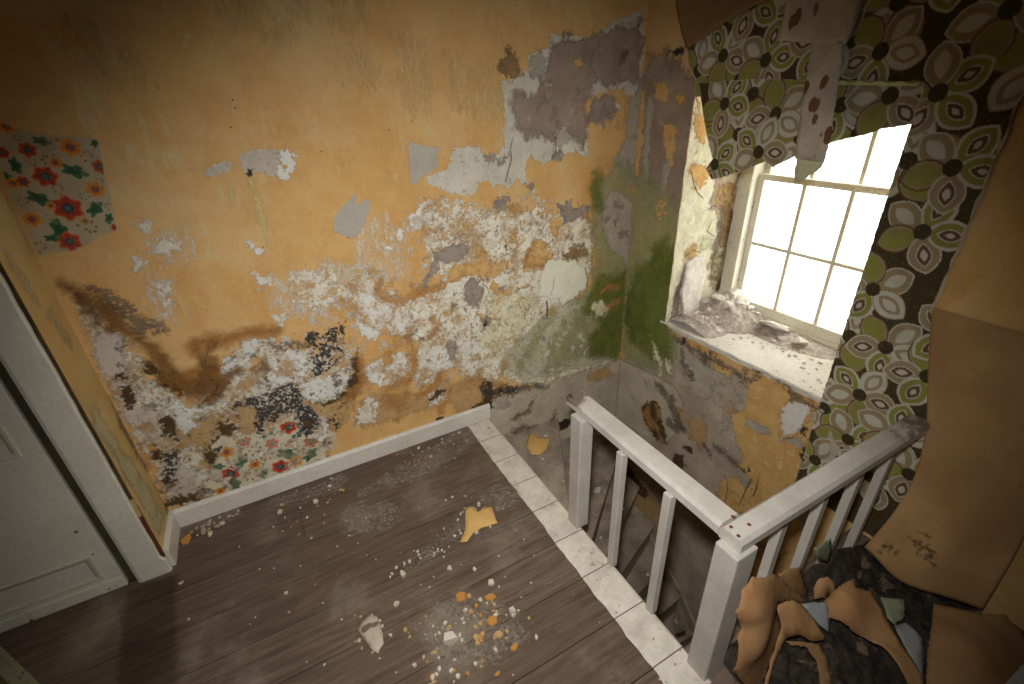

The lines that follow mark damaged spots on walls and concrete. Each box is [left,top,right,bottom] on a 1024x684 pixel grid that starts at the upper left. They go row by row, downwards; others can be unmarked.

peeling [131,217,197,323]
peeling [245,240,268,255]
peeling [250,8,740,440]
peeling [91,407,163,533]
leakage [57,282,368,508]
flaking render [592,427,610,449]
peeling [716,368,812,516]
peeling [756,535,770,558]
peeling [776,515,802,564]